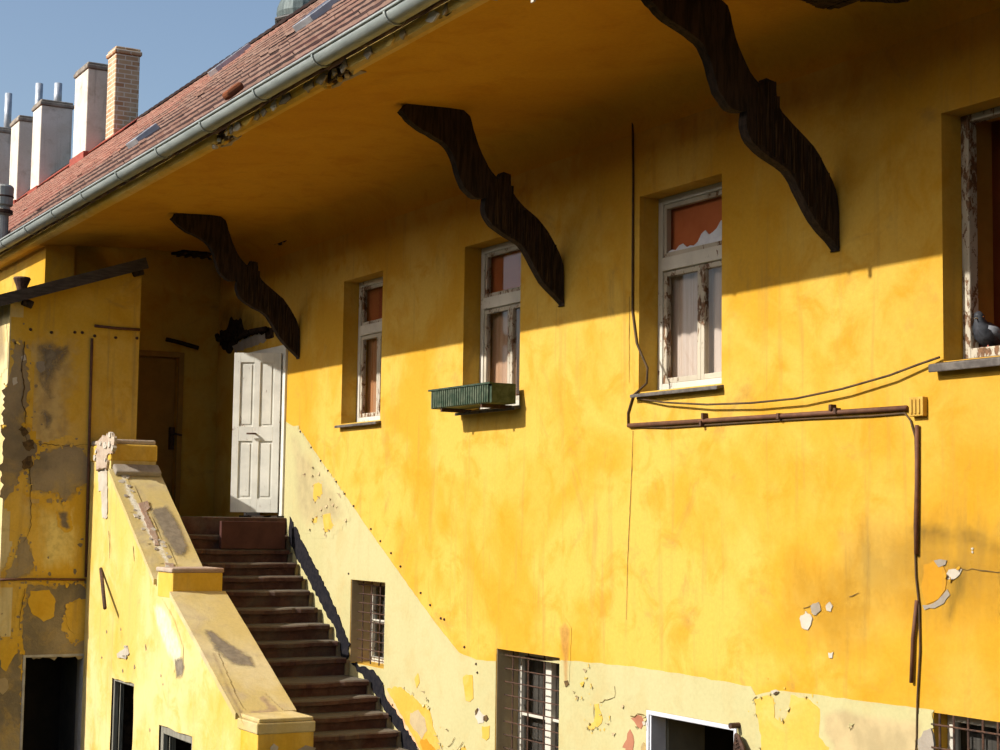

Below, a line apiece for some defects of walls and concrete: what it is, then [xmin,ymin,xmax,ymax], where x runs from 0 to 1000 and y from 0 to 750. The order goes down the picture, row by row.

peeling [0,317,177,750]
peeling [303,468,347,537]
peeling [151,598,183,672]
spalling [800,602,833,630]
peeling [921,559,963,610]
peeling [384,673,466,750]
peeling [572,664,648,750]
peeling [748,687,829,750]